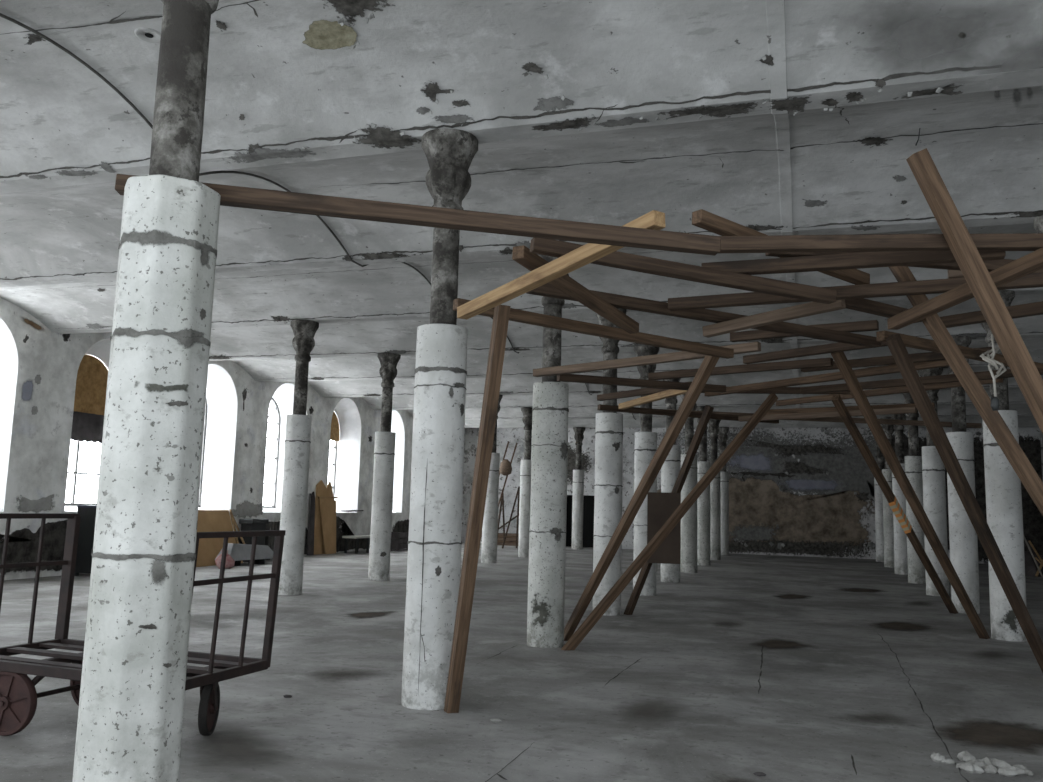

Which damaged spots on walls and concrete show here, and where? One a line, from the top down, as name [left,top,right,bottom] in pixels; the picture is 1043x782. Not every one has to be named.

flaking render [303,0,395,50]
crack [201,131,368,154]
crack [394,66,995,175]
flaking render [532,92,865,132]
crack [882,123,1043,139]
crack [0,158,150,178]
crack [318,180,426,188]
leakage [875,622,929,631]
crack [880,635,969,782]
leakage [940,721,1043,751]
crack [485,743,533,782]